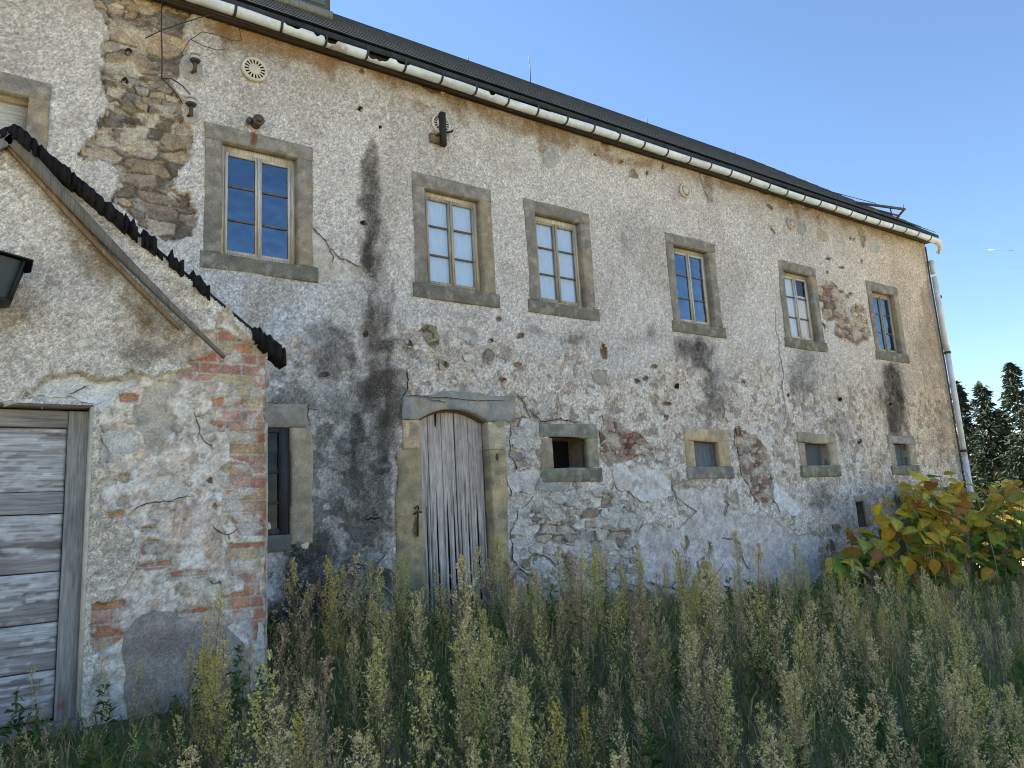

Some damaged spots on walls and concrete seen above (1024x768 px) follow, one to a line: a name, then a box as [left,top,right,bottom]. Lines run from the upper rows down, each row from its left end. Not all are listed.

flaking render [76,0,198,242]
crack [312,228,362,267]
leakage [342,144,402,469]
flaking render [817,256,871,346]
leakage [880,364,906,436]
peeling [0,303,271,730]
crack [133,495,191,511]
peeling [507,411,842,600]